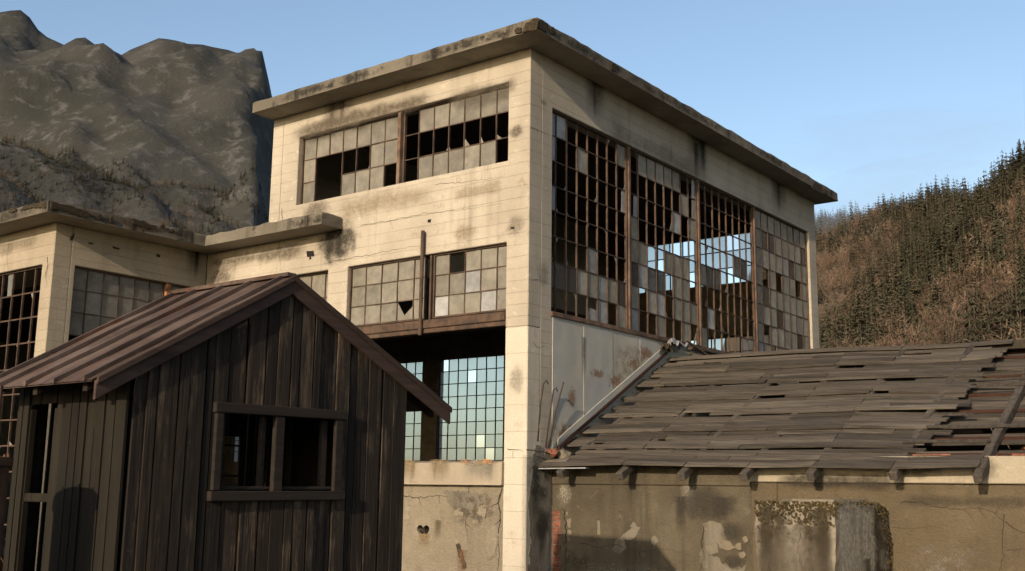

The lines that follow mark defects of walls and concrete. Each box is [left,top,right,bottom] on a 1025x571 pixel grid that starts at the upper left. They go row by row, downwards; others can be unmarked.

damp [320,229,355,263]
flaking render [553,509,571,571]
flaking render [612,522,640,553]
flaking render [699,521,749,571]
damp [760,506,770,550]
damp [815,507,887,571]
crack [896,501,1025,571]